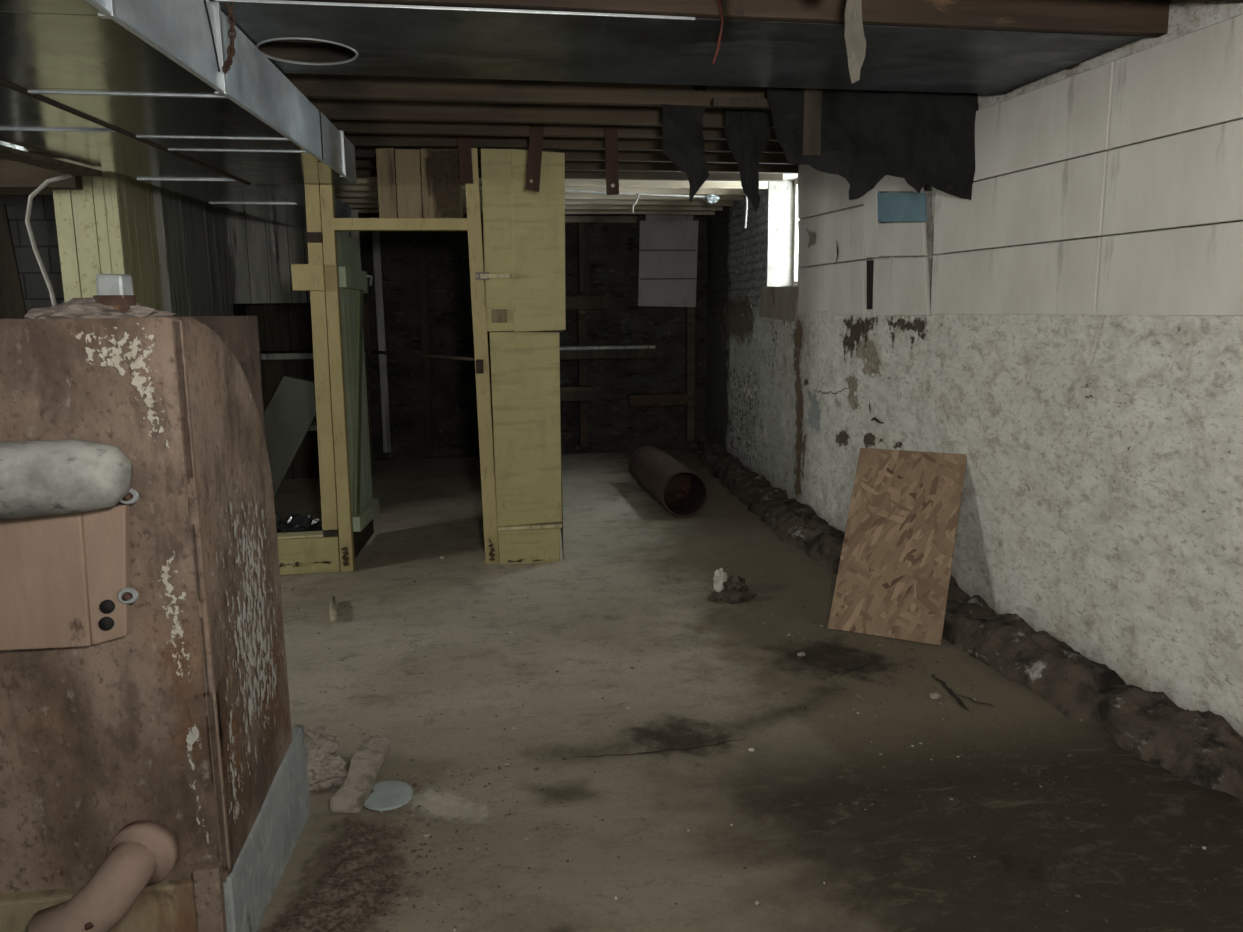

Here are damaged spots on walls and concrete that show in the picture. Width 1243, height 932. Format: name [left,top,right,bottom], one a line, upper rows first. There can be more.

flaking render [844,335,883,410]
flaking render [835,427,905,450]
damp [776,643,891,680]
damp [632,717,725,753]